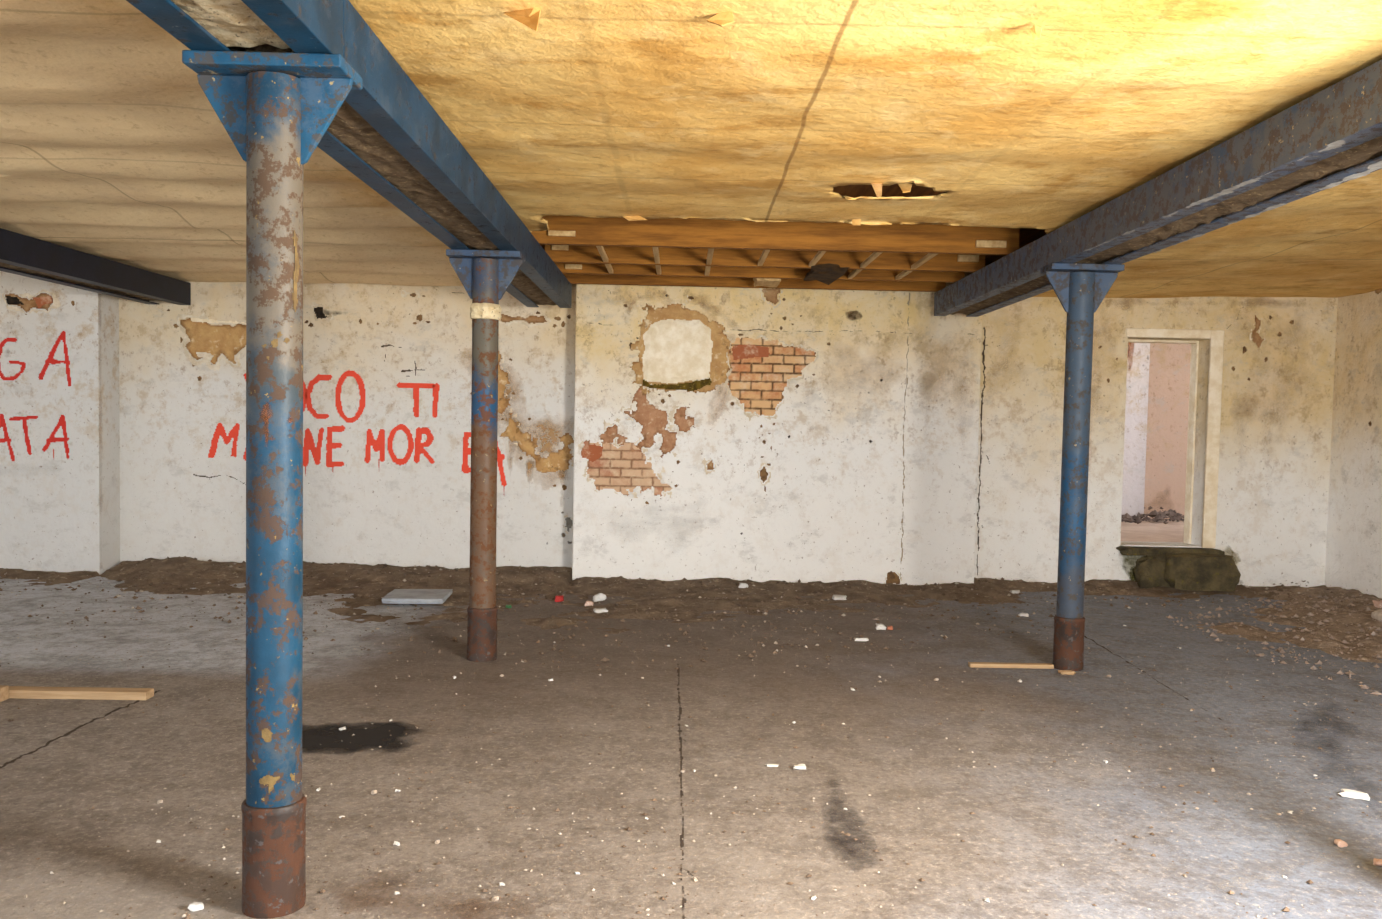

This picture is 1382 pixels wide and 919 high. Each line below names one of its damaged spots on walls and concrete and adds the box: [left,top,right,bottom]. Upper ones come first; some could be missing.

spalling [2,289,75,315]
flaking render [167,309,290,381]
flaking render [499,311,571,328]
flaking render [498,348,583,490]
flaking render [599,288,831,504]
crack [677,668,692,919]